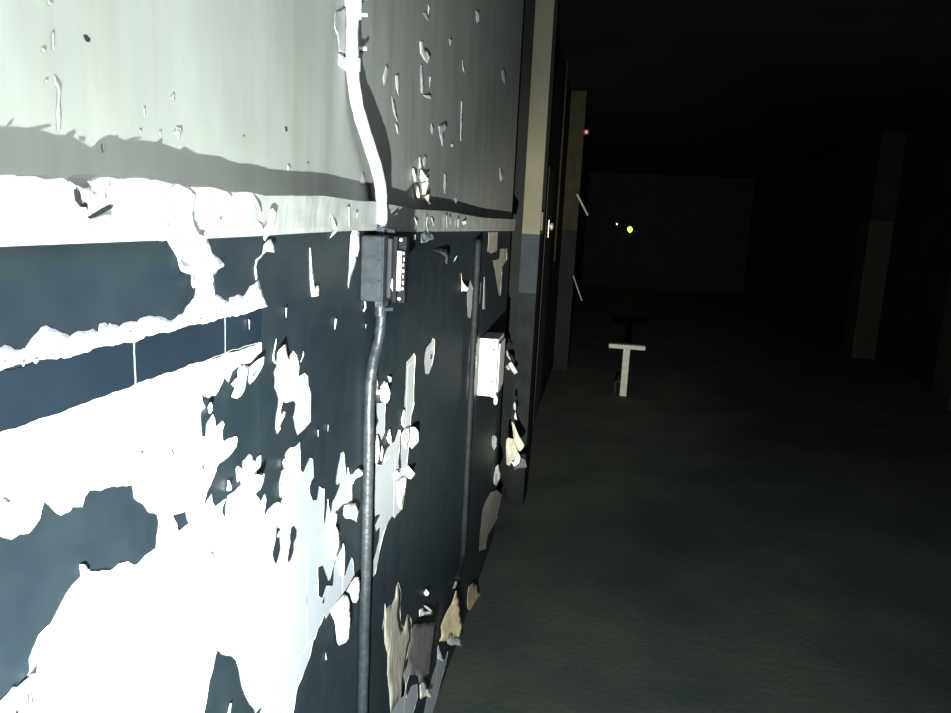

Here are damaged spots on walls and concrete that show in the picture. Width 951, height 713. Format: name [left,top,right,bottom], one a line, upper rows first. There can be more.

peeling [383,65,399,133]
peeling [420,40,431,99]
peeling [431,101,463,147]
peeling [412,156,431,204]
peeling [414,217,457,264]
peeling [0,177,363,713]
peeling [373,338,435,576]
peeling [479,402,527,551]
peeling [382,581,481,713]